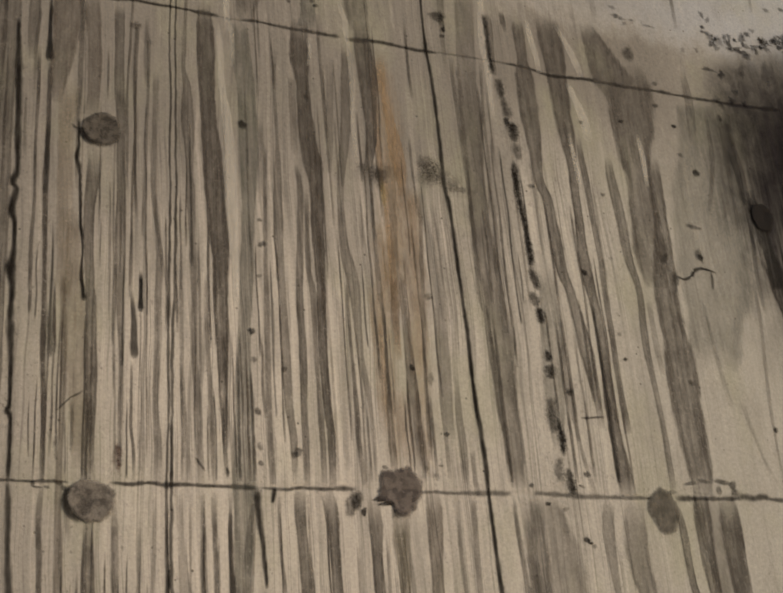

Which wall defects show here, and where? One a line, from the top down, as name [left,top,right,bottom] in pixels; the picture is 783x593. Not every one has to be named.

crack [2,22,64,593]
crack [74,122,86,299]
crack [115,0,353,593]
crack [249,0,504,593]
crack [545,351,554,378]
crack [549,391,577,492]
crack [482,17,733,323]
crack [681,494,783,502]
water stain [720,65,783,315]